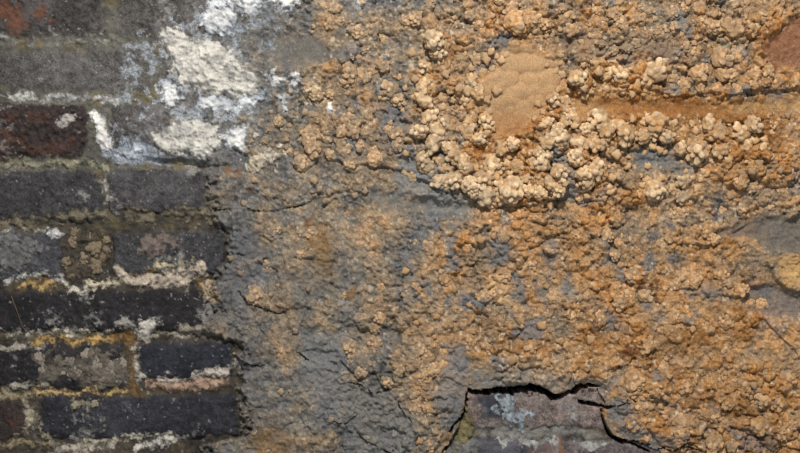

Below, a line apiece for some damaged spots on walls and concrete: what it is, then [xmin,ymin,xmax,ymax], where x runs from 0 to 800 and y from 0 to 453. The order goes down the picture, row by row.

water stain [270,66,286,87]
water stain [276,93,290,112]
water stain [56,113,76,128]
water stain [88,109,161,165]
water stain [150,119,248,161]
water stain [245,144,285,174]
crack [445,383,699,452]